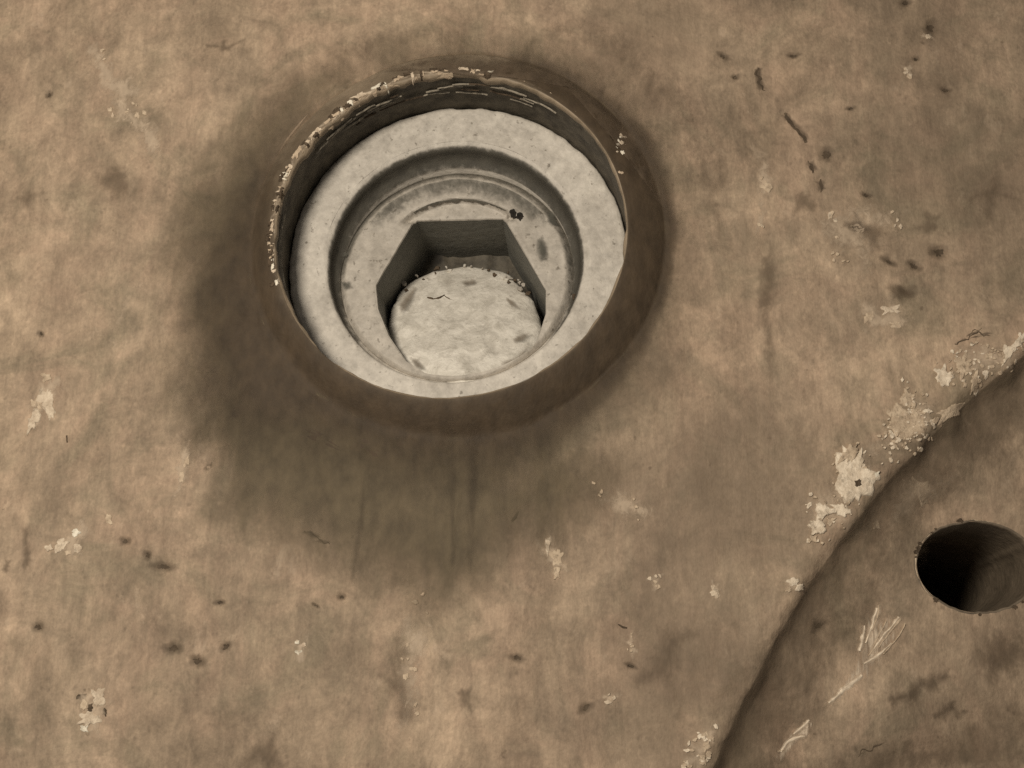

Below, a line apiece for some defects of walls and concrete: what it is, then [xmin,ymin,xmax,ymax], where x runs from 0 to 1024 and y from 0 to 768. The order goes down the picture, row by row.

peeling [26,373,60,436]
leakage [189,65,673,591]
spalling [805,332,1024,545]
peeling [76,687,107,732]